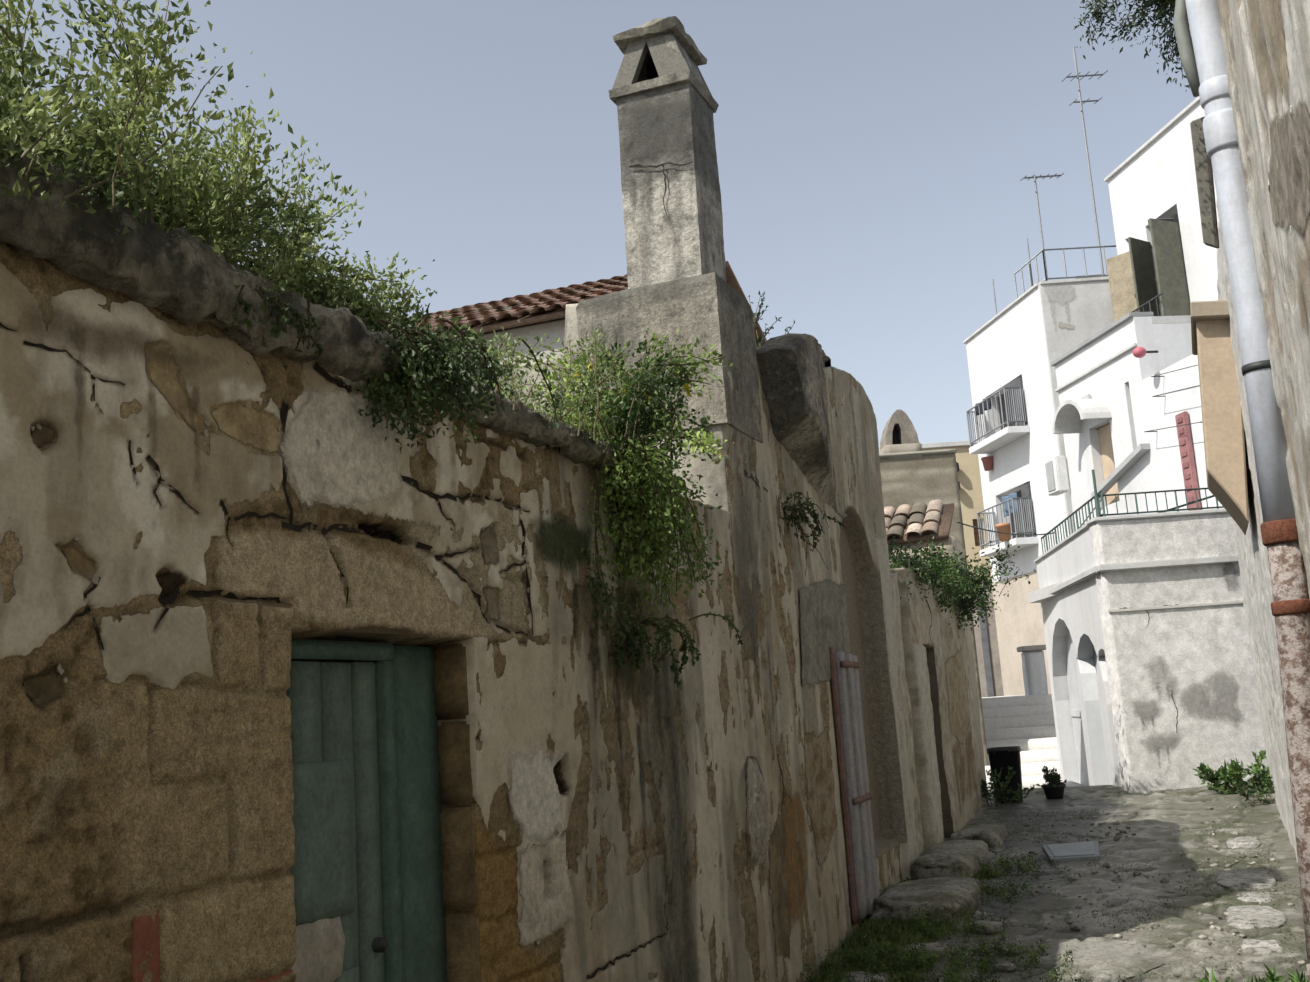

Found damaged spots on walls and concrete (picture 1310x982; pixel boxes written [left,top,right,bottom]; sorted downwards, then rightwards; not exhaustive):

crack [0,323,125,414]
flaking render [146,340,283,453]
crack [314,362,433,426]
crack [128,400,533,635]
flaking render [480,524,499,565]
crack [65,576,104,650]
hole [156,572,188,598]
damp [1134,657,1240,724]
spalling [553,762,568,794]
damp [1146,736,1176,755]
flaking render [769,808,792,959]
crack [587,934,665,979]